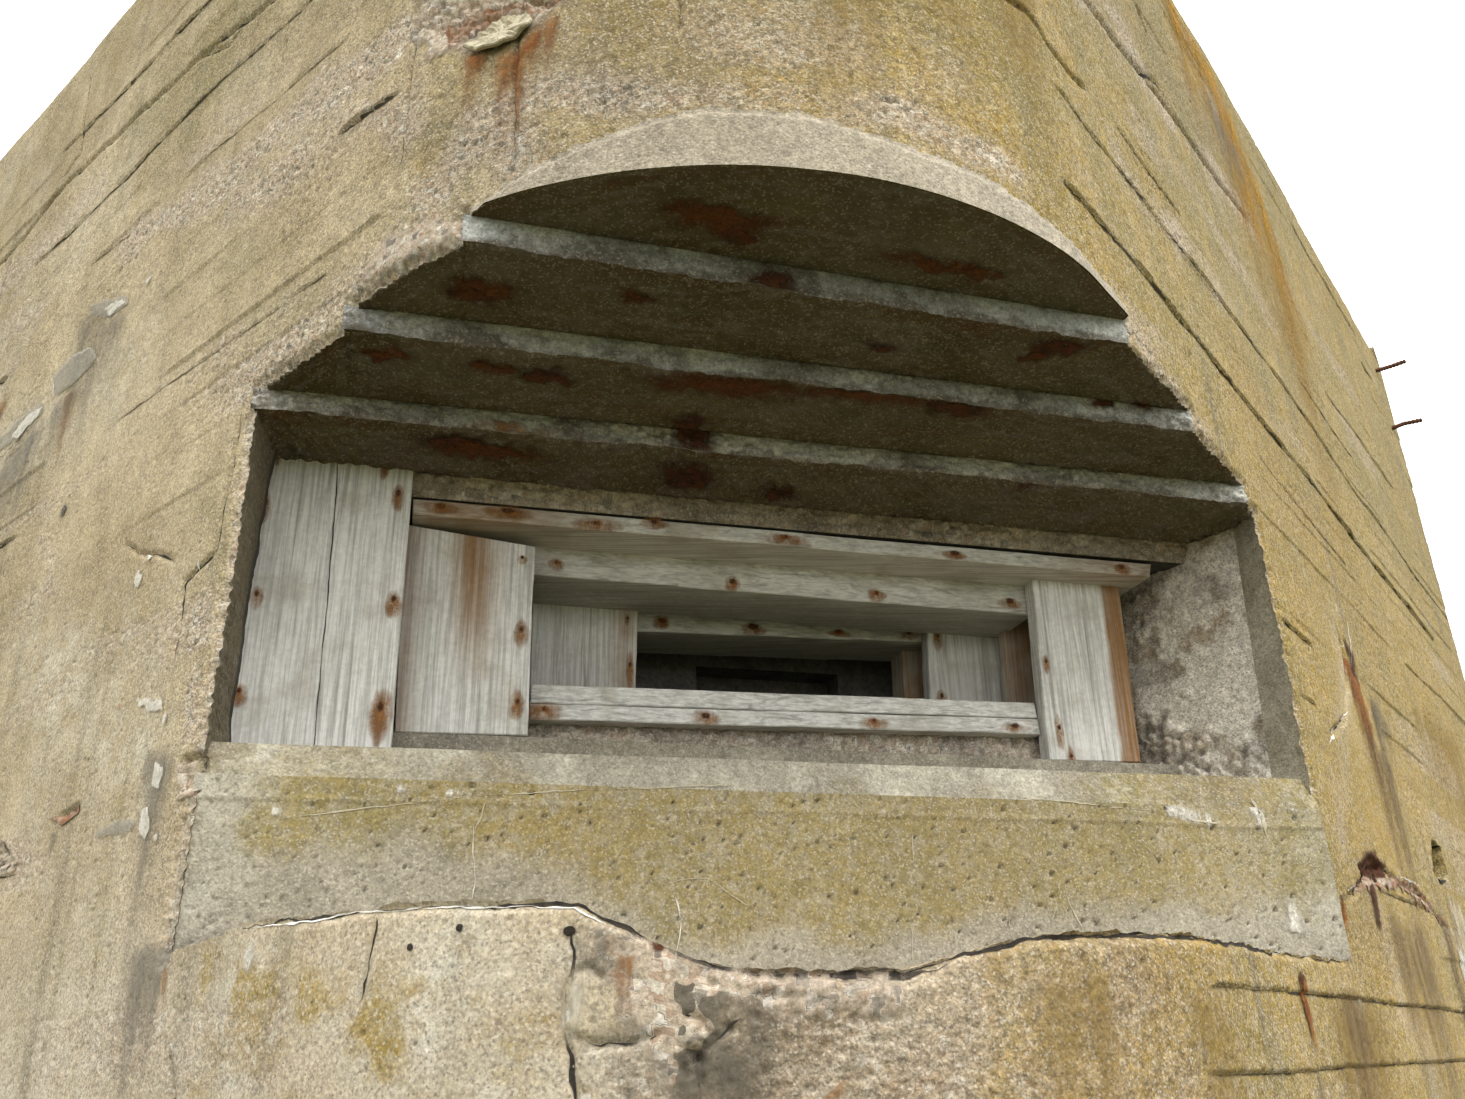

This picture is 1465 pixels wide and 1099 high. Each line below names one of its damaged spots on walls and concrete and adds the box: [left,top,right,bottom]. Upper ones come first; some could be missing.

spalling [410,0,564,59]
rust [466,15,557,116]
rust [751,269,795,291]
rust [468,360,571,388]
rust [654,373,984,418]
rust [674,414,716,451]
rust [381,467,403,509]
rust [1343,638,1401,829]
rust [1341,850,1444,930]
crack [244,784,1345,1099]
spalling [597,928,905,1088]
rust [1299,972,1315,1039]